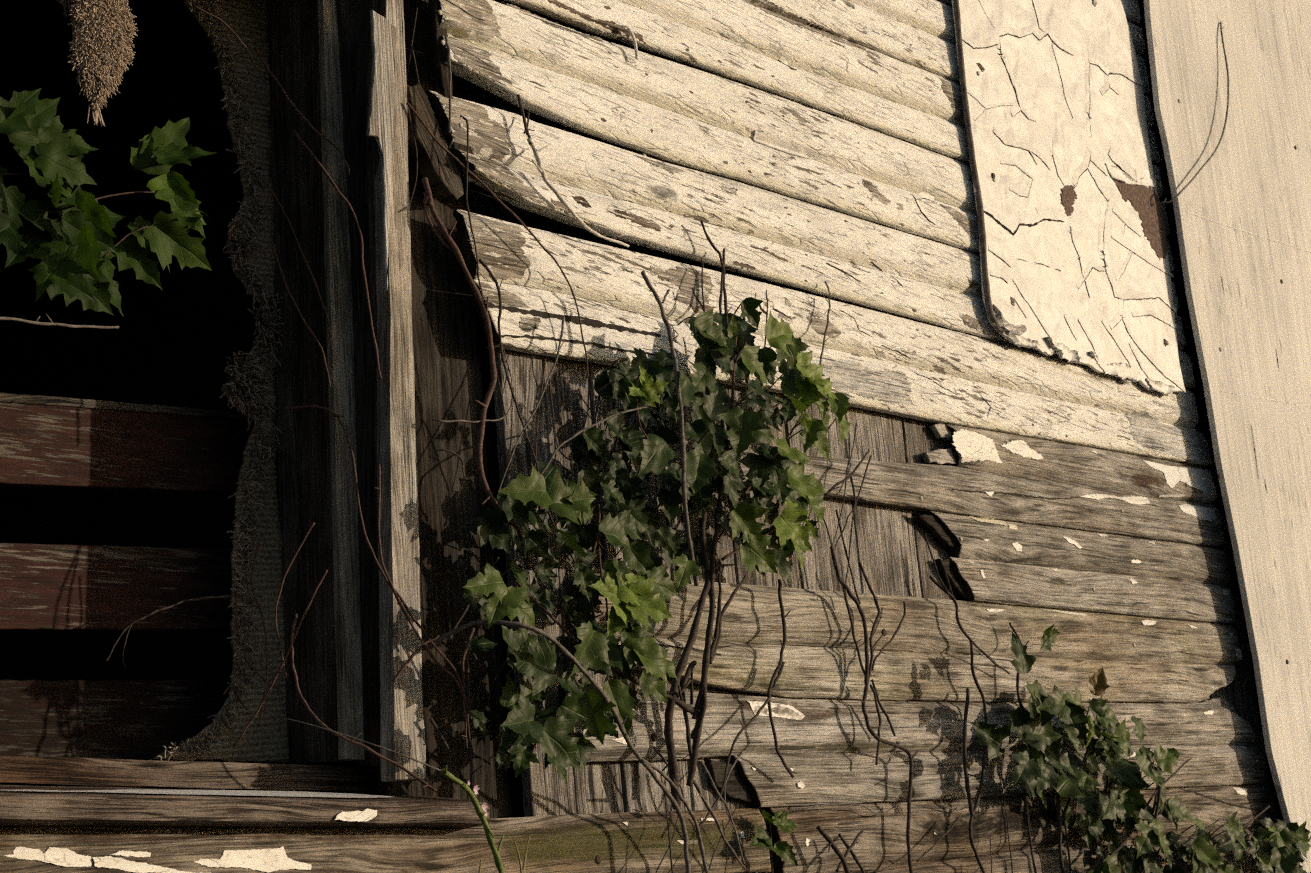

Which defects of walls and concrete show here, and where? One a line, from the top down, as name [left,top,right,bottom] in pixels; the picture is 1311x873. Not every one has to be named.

peeling [439,0,504,82]
peeling [549,0,643,60]
peeling [743,0,866,51]
peeling [430,91,673,232]
peeling [863,179,904,210]
crack [961,0,1185,392]
peeling [457,210,541,332]
peeling [650,266,716,313]
peeling [959,304,1181,395]
peeling [952,423,1043,464]
peeling [1080,411,1217,522]
peeling [4,846,312,873]